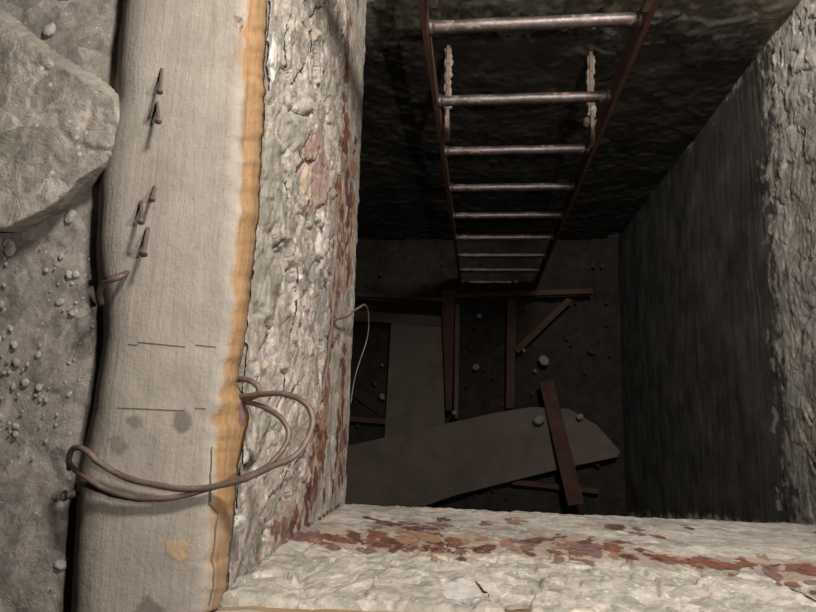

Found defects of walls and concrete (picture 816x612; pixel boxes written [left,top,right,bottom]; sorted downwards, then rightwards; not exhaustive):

crack [283,3,325,84]
crack [283,108,332,221]
crack [264,255,325,331]
rust [264,15,816,594]